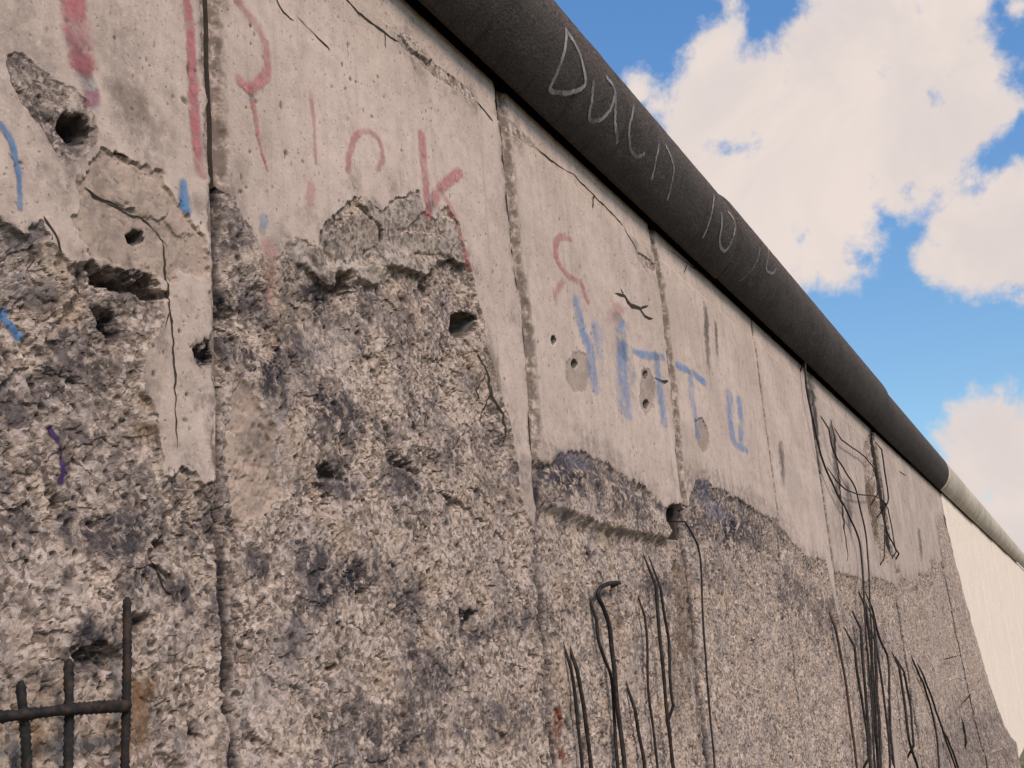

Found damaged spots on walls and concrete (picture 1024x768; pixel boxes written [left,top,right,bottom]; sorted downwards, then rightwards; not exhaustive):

crack [277,0,330,50]
crack [347,0,399,46]
spalling [6,51,99,166]
crack [532,144,637,250]
crack [85,187,178,447]
spalling [0,146,230,768]
spalling [209,187,1021,768]